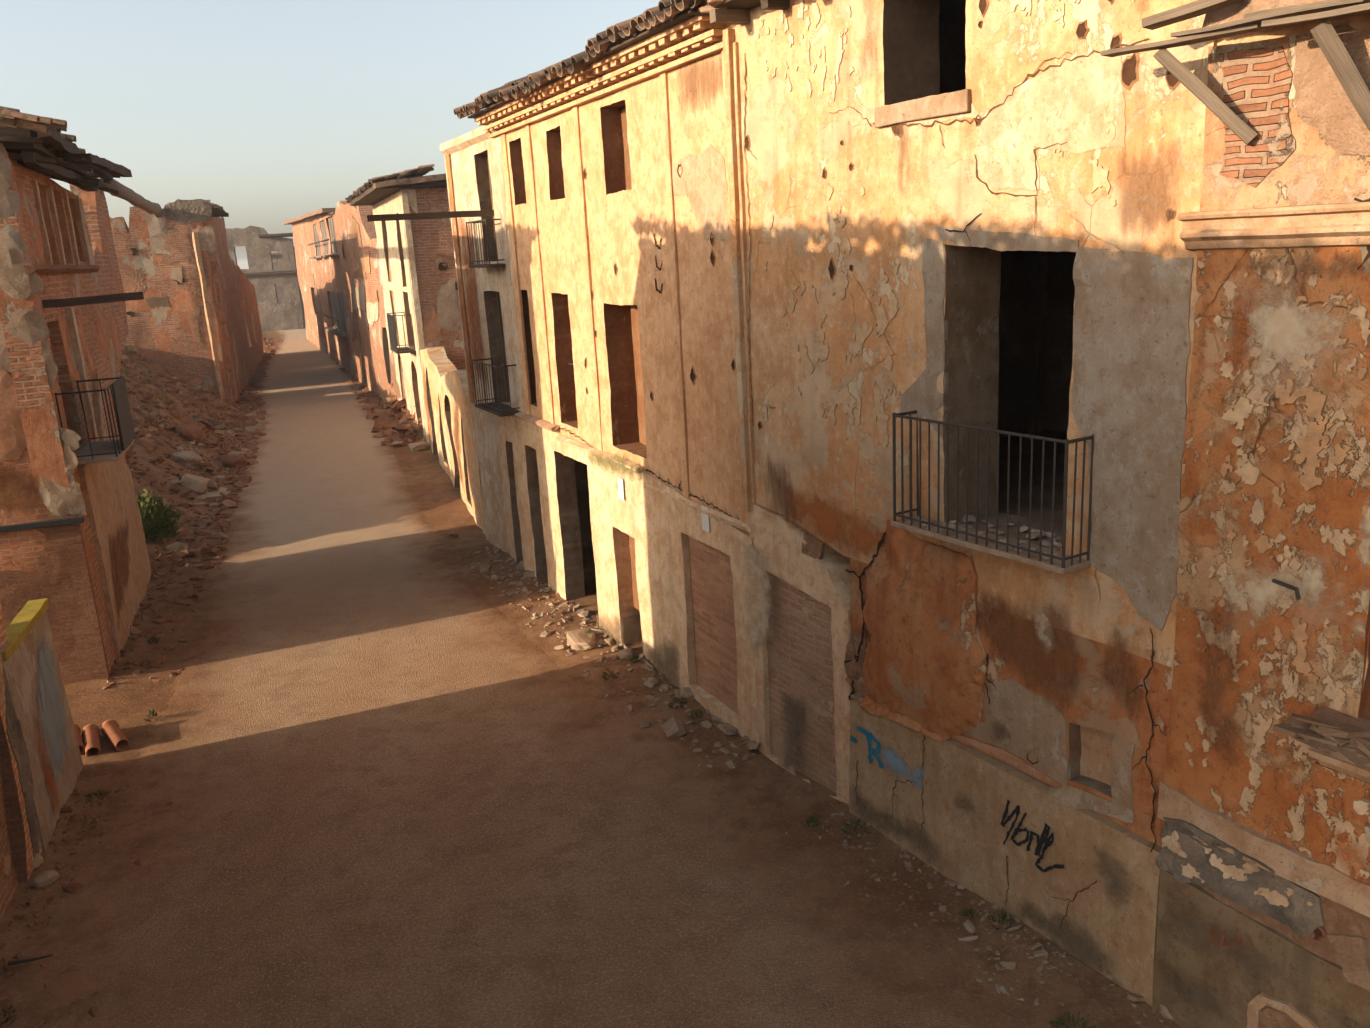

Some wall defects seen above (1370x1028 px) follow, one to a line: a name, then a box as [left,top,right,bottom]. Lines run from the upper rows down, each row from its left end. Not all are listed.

peeling [758,0,874,127]
crack [829,38,1149,241]
flaking render [891,0,1140,207]
flaking render [1218,46,1296,188]
peeling [782,167,900,374]
peeling [1206,307,1359,509]
peeling [1332,306,1370,379]
crack [844,531,886,700]
crack [1127,628,1167,852]
peeling [1184,715,1225,767]
spalling [1155,817,1370,991]
peeling [1353,798,1370,844]